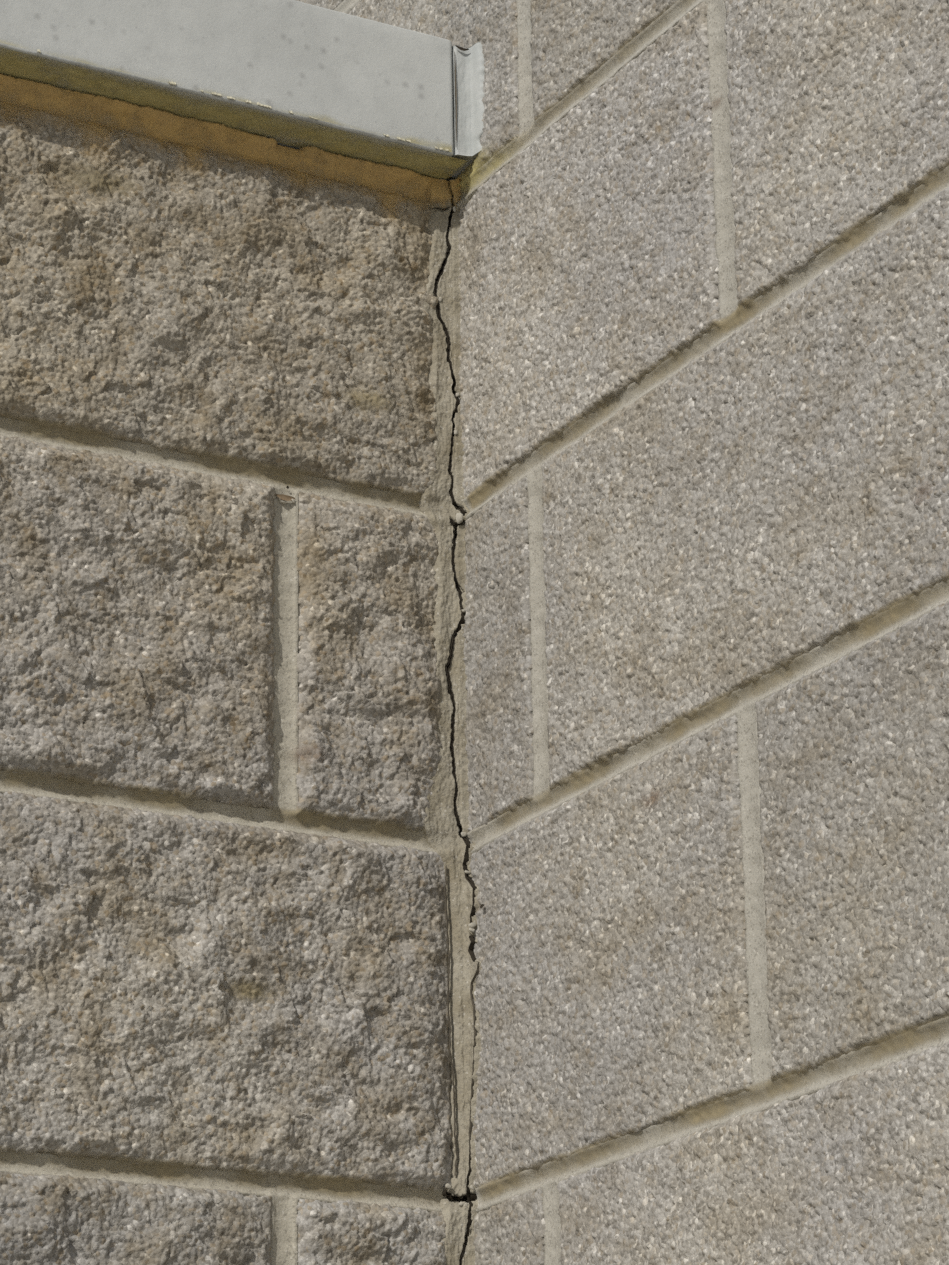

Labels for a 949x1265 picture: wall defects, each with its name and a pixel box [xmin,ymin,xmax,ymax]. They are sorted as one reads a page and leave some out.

crack [430,178,479,1265]